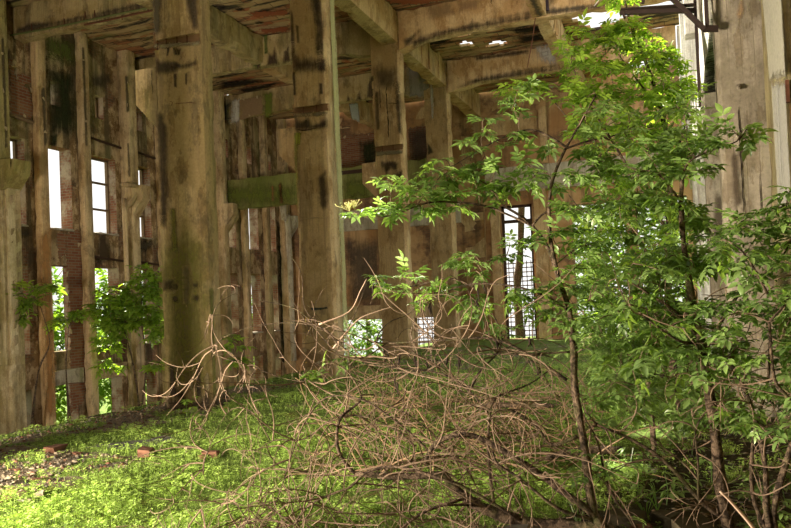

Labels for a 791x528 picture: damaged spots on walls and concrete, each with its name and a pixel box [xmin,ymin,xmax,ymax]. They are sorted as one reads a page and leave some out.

damp [46,37,74,65]
peeling [1,8,153,148]